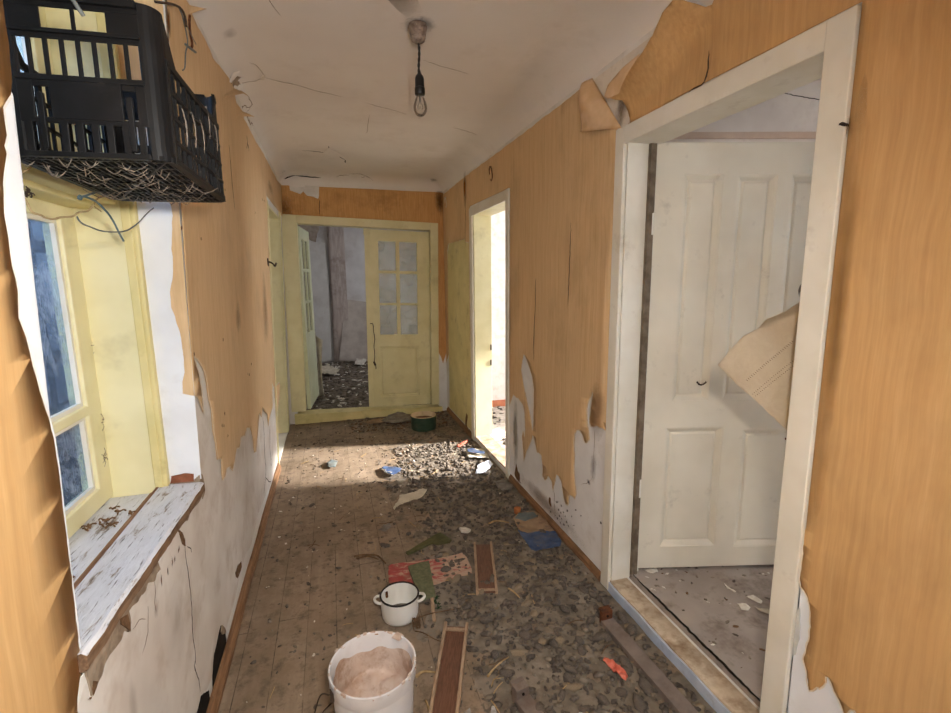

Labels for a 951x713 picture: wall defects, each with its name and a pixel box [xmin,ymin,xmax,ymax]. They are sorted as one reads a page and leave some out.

peeling [578,36,652,132]
peeling [5,94,81,648]
peeling [77,202,280,713]
peeling [509,354,606,570]
crack [185,546,200,687]
peeling [786,550,856,713]